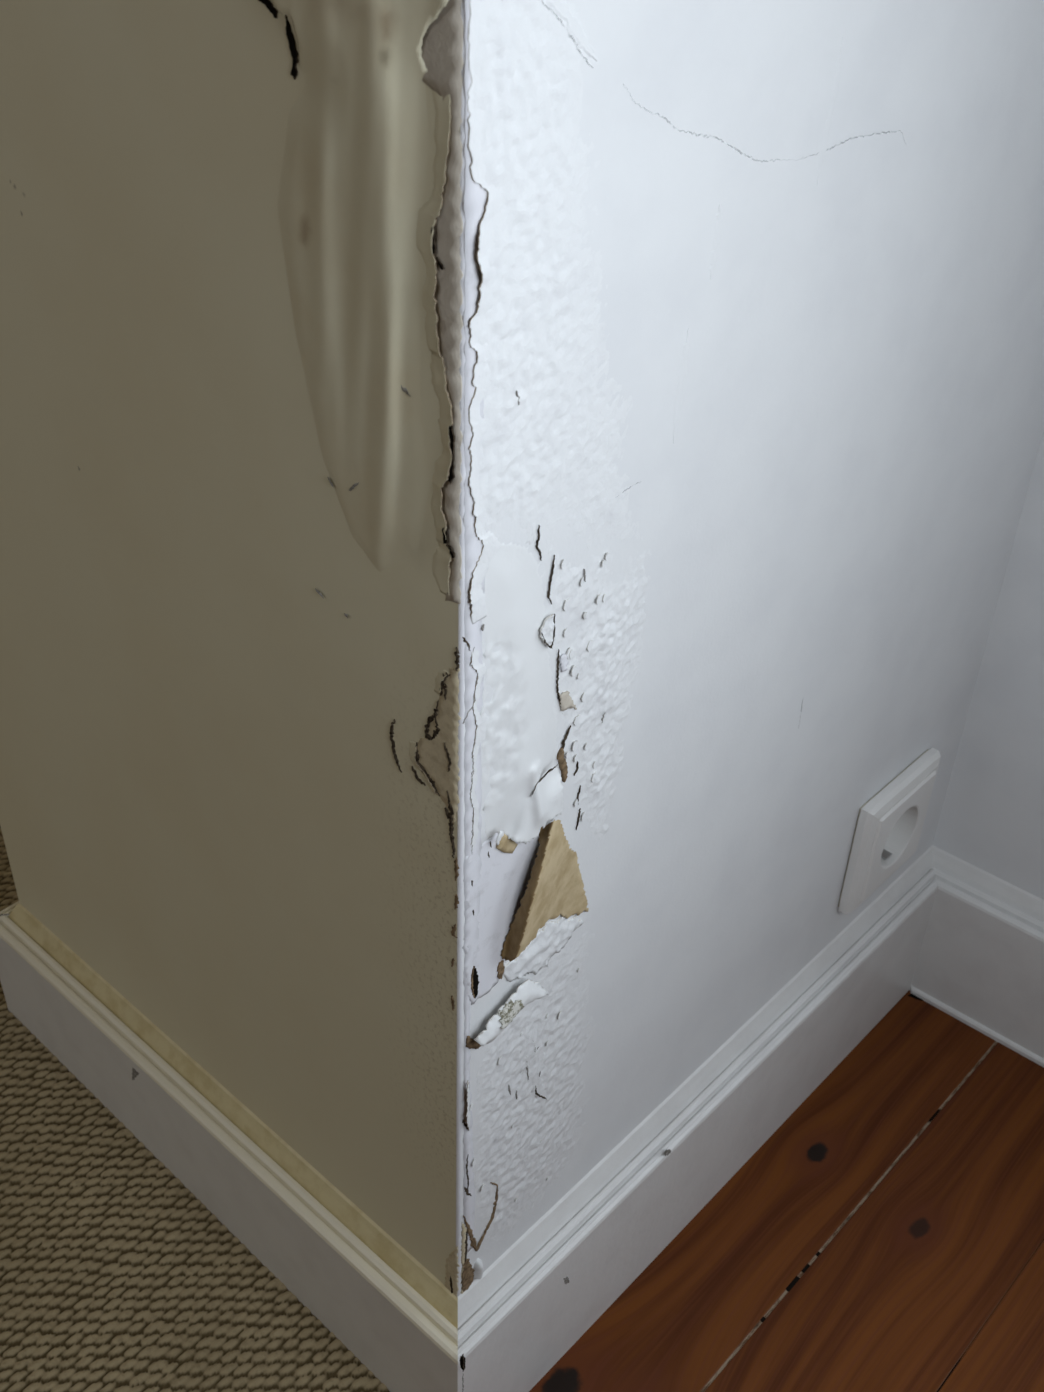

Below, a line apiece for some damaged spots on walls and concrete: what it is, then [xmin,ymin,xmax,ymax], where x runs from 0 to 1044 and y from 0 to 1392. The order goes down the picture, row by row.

flaking render [390,0,589,1297]